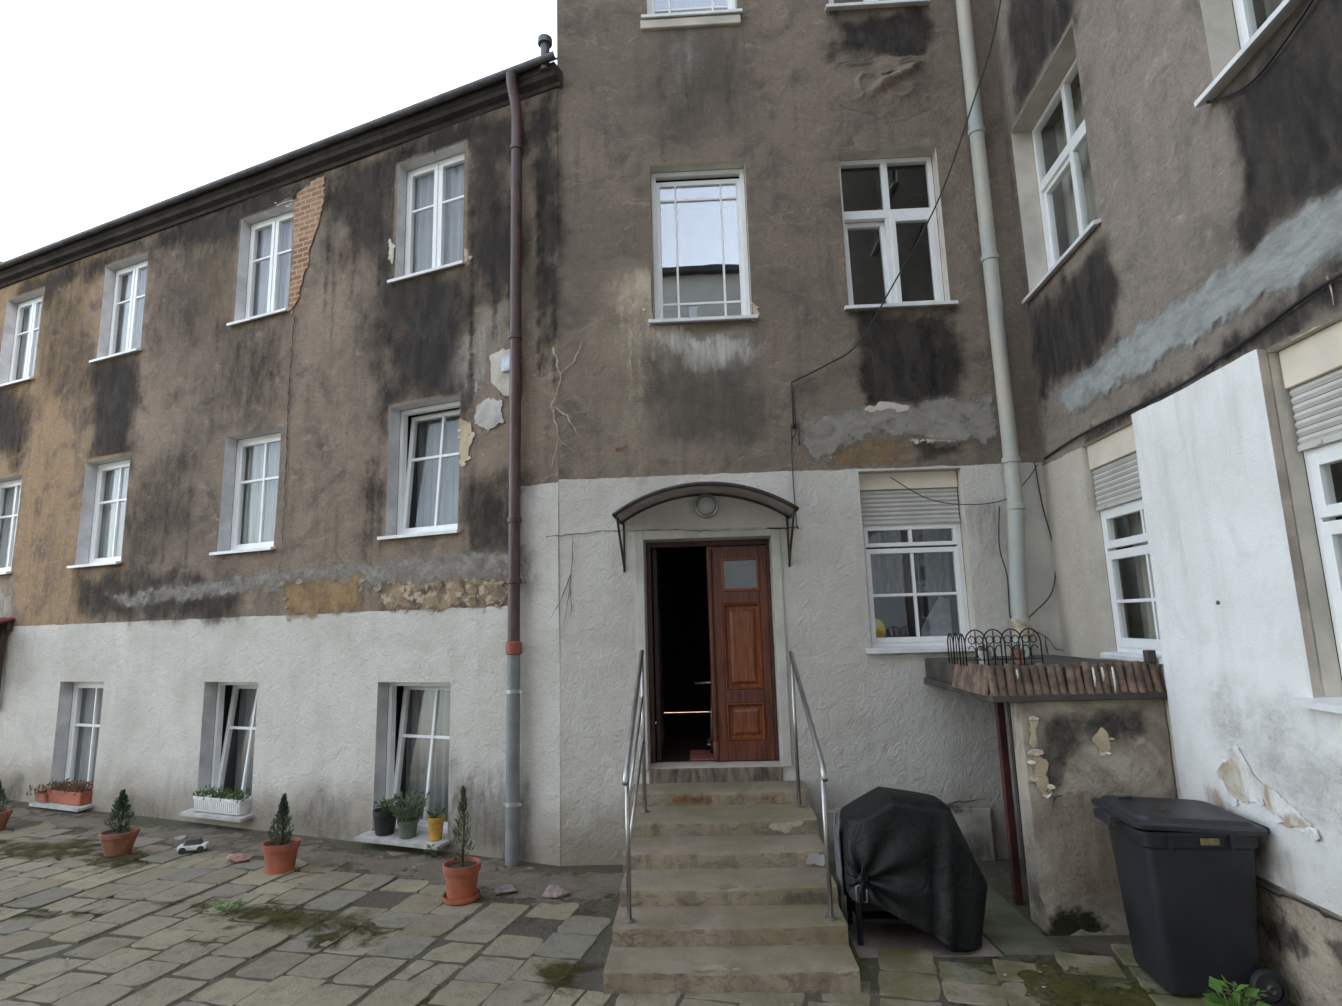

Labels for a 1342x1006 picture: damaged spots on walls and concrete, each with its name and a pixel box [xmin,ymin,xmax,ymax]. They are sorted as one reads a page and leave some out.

flaking render [274,175,326,314]
water stain [606,268,765,442]
crack [550,339,582,466]
flaking render [864,401,909,413]
flaking render [910,435,956,444]
flaking render [280,574,508,621]
flaking render [1027,716,1055,798]
flaking render [1092,727,1115,756]
peeling [1216,745,1320,841]
water stain [1263,919,1307,960]
water stain [1328,942,1342,966]